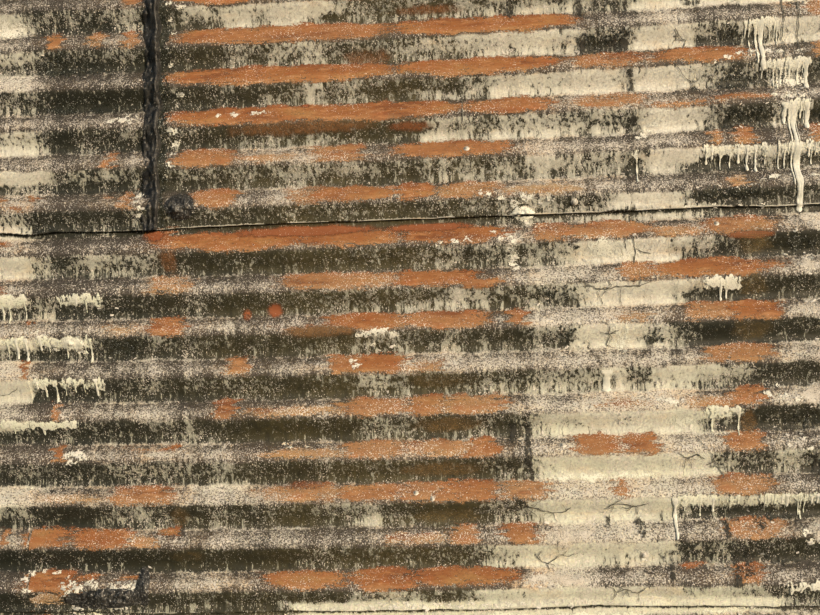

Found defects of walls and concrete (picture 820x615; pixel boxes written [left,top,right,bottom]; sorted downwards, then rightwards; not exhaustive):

rust [166,5,587,48]
rust [162,45,760,88]
rust [162,91,774,136]
rust [166,138,521,171]
rust [138,212,796,323]
rust [267,304,533,337]
rust [210,391,516,462]
rust [566,429,665,457]
rust [243,476,559,507]
rust [0,523,184,552]
rust [375,523,483,548]
rust [252,564,539,596]